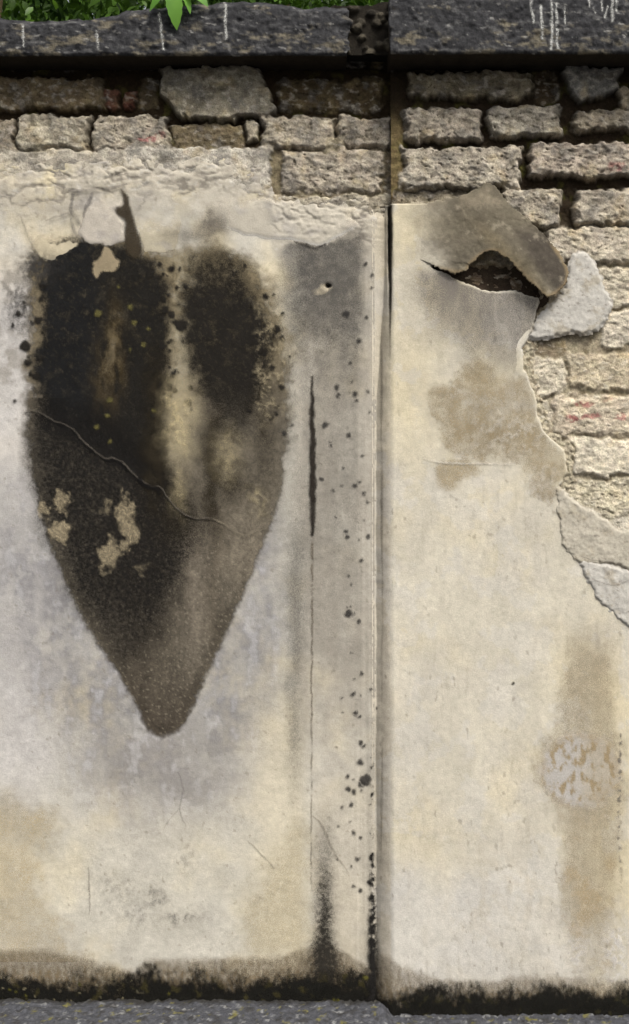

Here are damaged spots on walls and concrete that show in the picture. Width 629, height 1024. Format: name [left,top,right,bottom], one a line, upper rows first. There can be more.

damp [11,189,374,737]
spalling [0,1,629,627]
damp [418,273,564,500]
damp [0,805,629,1017]
mould [341,760,374,808]
damp [543,649,622,951]